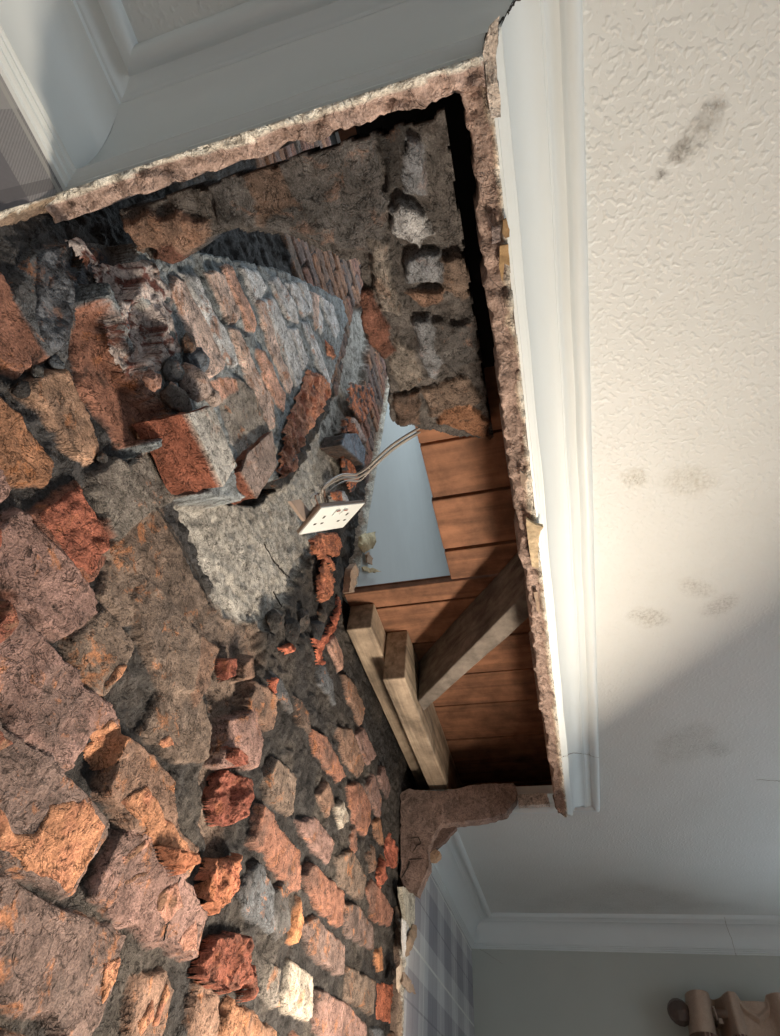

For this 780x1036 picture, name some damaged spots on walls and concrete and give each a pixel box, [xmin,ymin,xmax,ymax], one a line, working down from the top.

flaking render [0,17,568,1036]
crack [483,0,521,51]